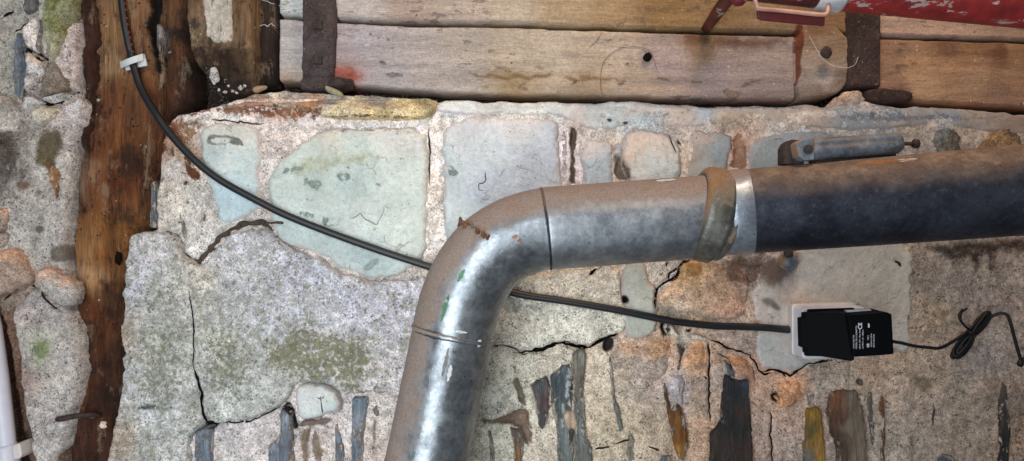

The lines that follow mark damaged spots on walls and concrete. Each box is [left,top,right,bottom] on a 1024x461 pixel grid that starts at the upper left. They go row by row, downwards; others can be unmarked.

crack [167,219,284,264]
crack [654,260,689,308]
crack [189,293,278,437]
crack [495,333,618,355]
crack [703,338,829,422]